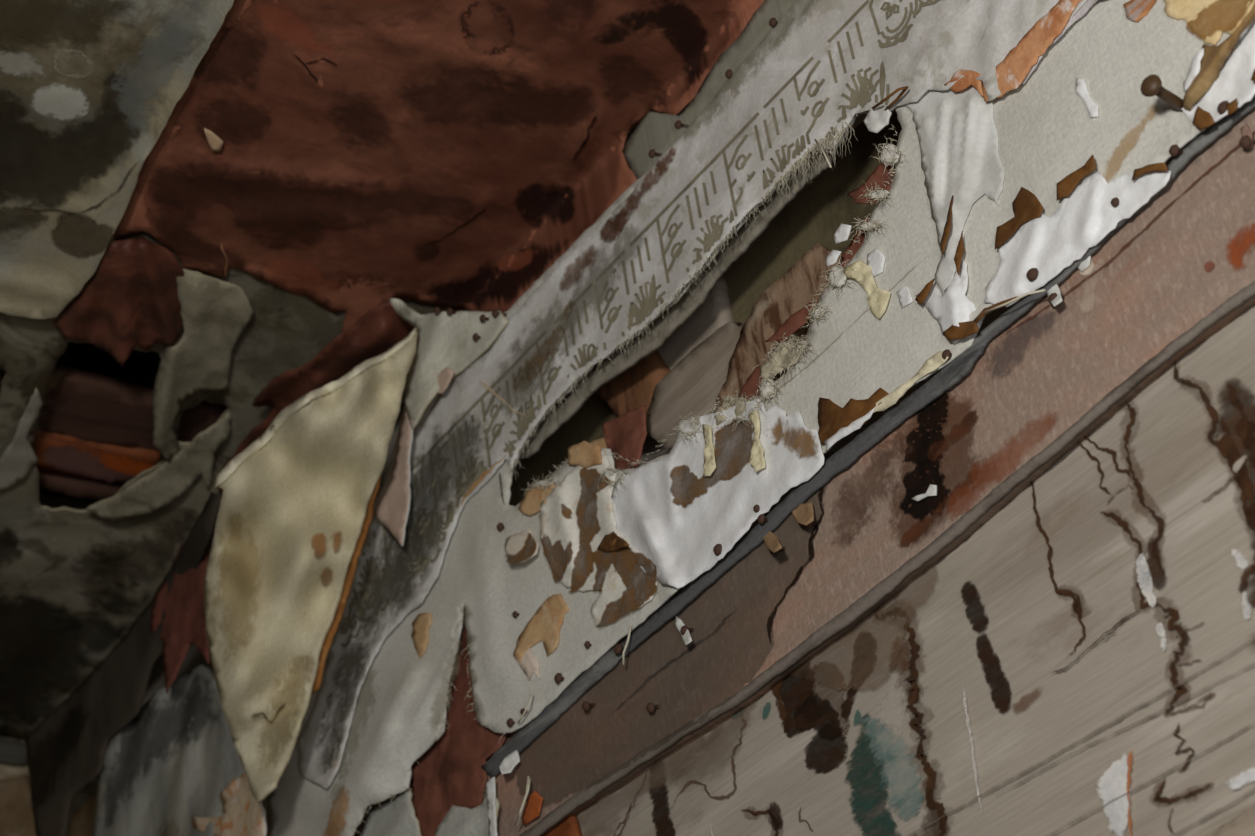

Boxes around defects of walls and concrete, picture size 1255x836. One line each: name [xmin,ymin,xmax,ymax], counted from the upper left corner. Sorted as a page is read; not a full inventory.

damp [0,0,140,257]
rust [600,148,675,242]
peeling [1123,0,1255,130]
rust [1204,225,1255,271]
peeling [505,0,1171,681]
damp [670,419,753,507]
damp [772,419,815,457]
damp [839,397,974,542]
damp [1174,366,1255,606]
damp [0,509,194,806]
damp [517,468,948,836]
crack [1052,612,1137,673]